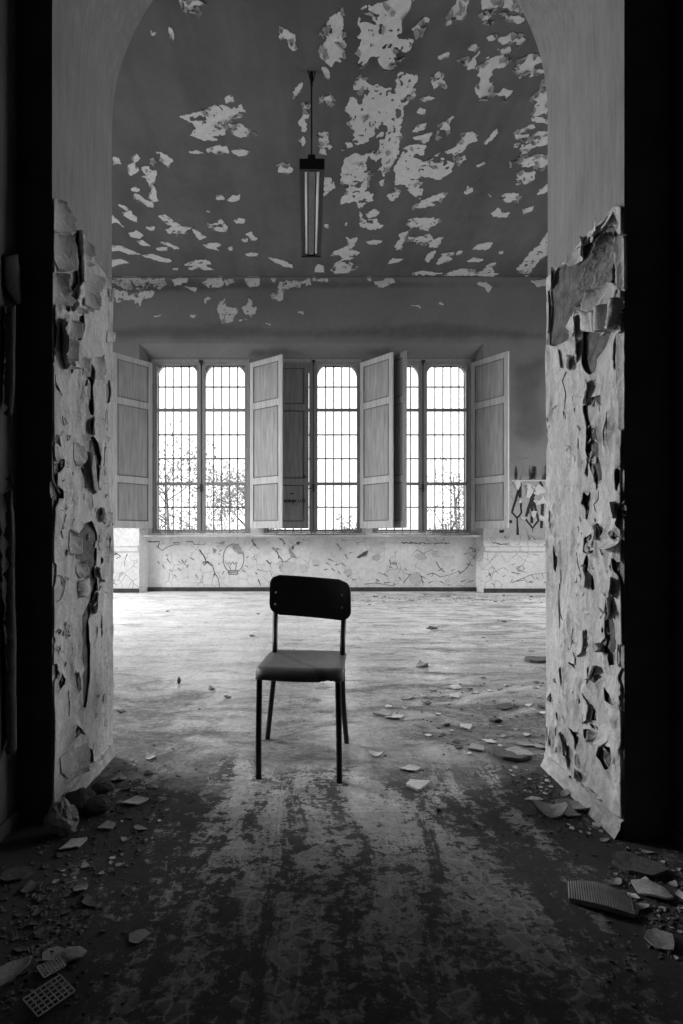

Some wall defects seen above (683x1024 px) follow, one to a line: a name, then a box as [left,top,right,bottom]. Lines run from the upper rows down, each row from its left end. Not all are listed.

peeling [49,0,548,803]
crack [98,535,221,587]
crack [251,538,291,585]
crack [324,535,581,650]
peeling [513,206,628,818]